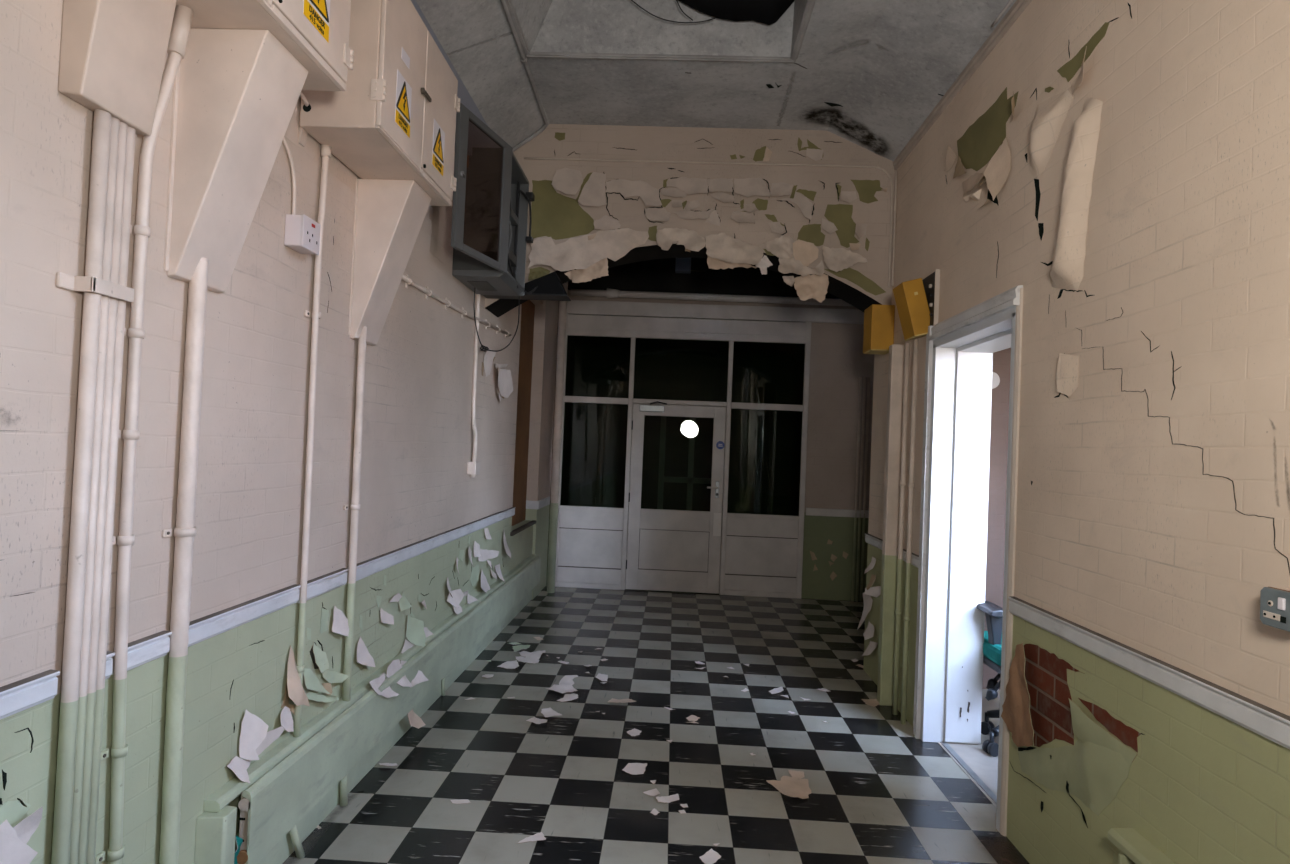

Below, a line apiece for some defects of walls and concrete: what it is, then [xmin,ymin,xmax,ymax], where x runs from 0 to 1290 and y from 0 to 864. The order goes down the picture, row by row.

peeling [730,146,772,162]
crack [1048,295,1290,573]
peeling [447,528,511,614]
peeling [227,591,434,784]
spalling [1001,642,1141,758]
peeling [0,770,43,864]